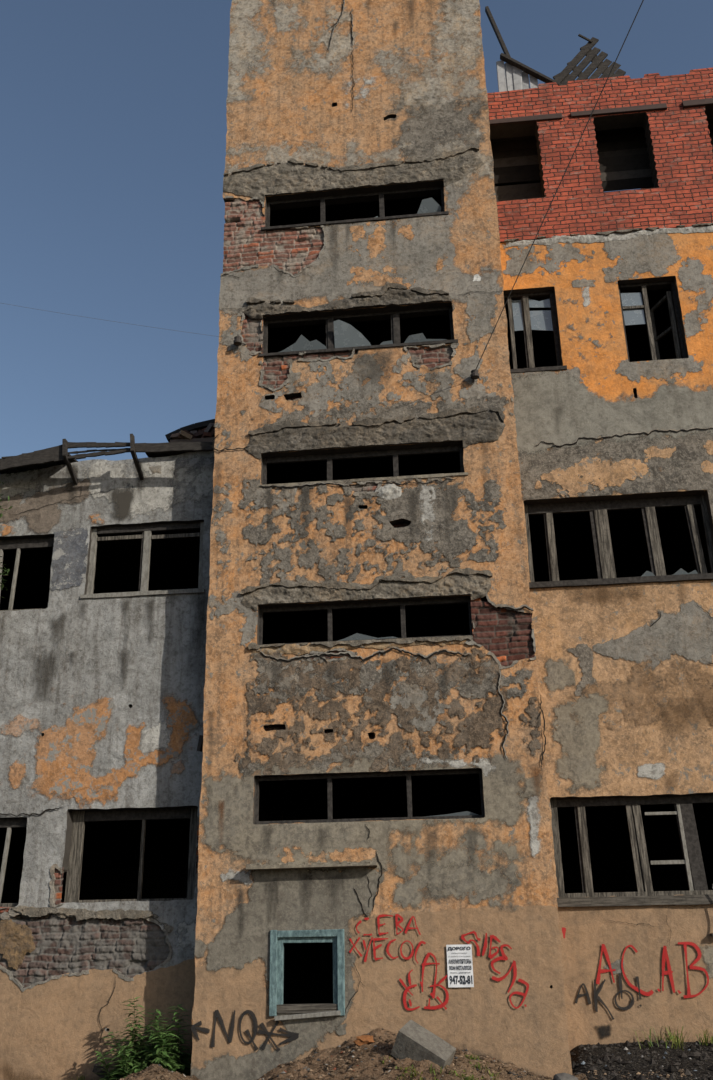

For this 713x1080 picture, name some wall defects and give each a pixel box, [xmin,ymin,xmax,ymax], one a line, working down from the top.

crack [328,0,355,112]
peeling [219,0,713,520]
crack [536,426,713,448]
crack [257,646,471,664]
peeling [0,422,713,1080]
crack [353,825,386,917]